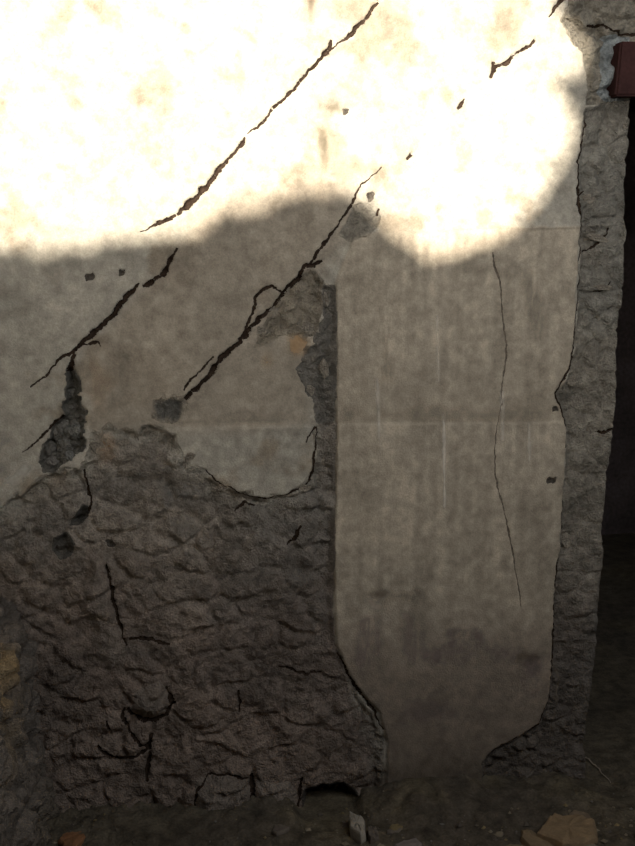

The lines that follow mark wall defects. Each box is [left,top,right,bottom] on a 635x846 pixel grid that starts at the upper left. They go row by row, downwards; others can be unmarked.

crack [140,2,379,232]
crack [489,39,535,78]
crack [549,0,564,17]
crack [30,248,178,388]
crack [183,167,382,400]
crack [22,414,65,453]
crack [492,252,521,606]
flaking render [481,0,635,779]
crack [105,564,170,646]
flaking render [0,268,385,813]
crack [97,686,176,782]